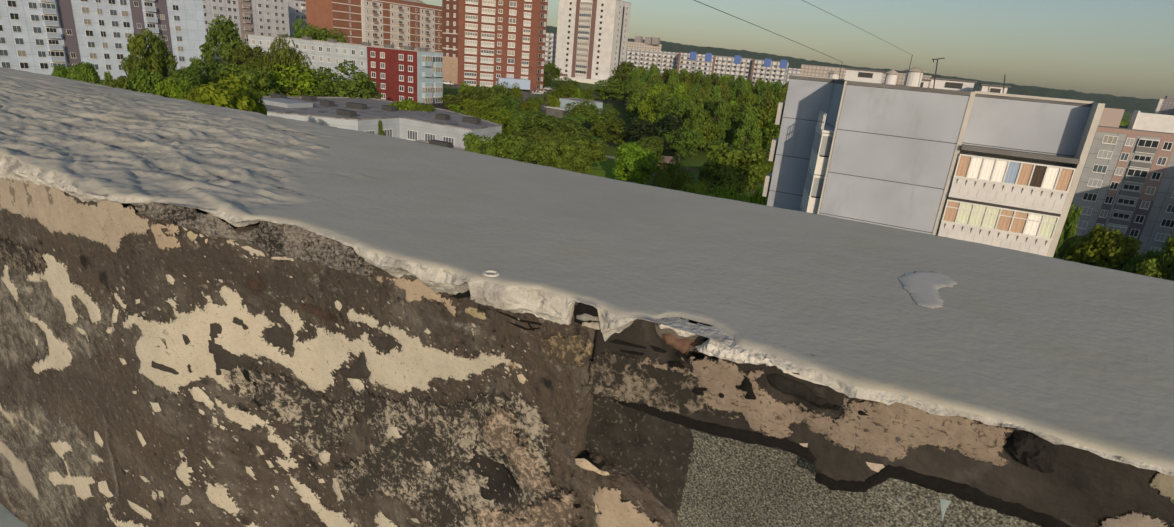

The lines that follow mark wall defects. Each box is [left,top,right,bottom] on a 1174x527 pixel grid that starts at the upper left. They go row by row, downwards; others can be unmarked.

peeling [0,179,487,336]
peeling [0,235,663,527]
peeling [540,302,1020,472]
peeling [1093,511,1173,527]
peeling [1149,472,1174,503]